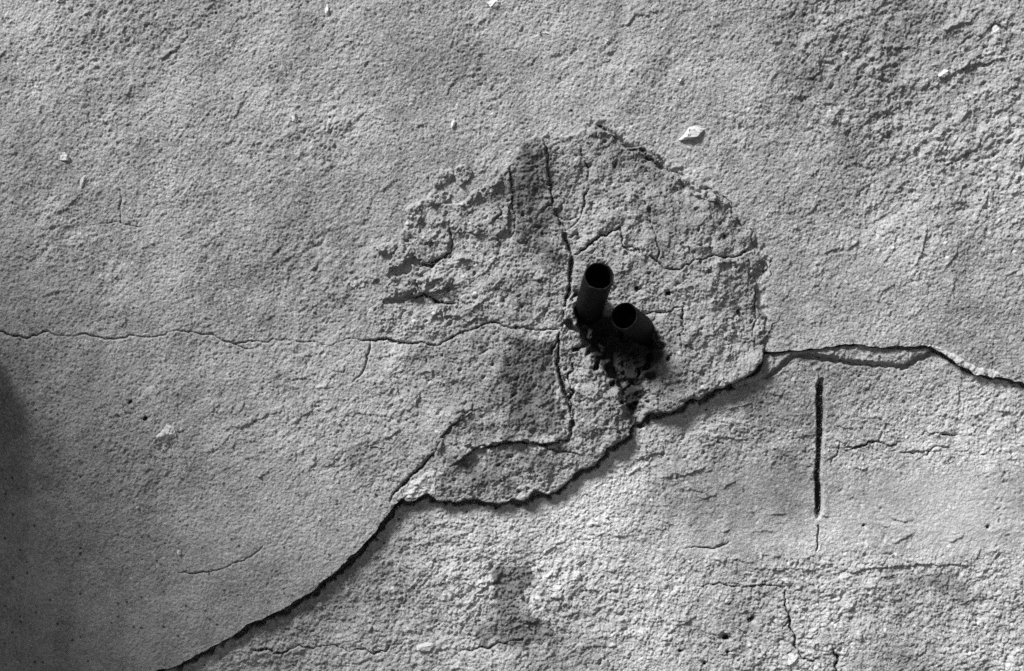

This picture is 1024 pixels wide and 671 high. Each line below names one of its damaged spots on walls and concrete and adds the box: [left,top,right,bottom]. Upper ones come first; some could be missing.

crack [0,125,780,497]
crack [832,431,955,458]
crack [179,551,258,574]
crack [700,582,839,671]
crack [252,640,404,655]